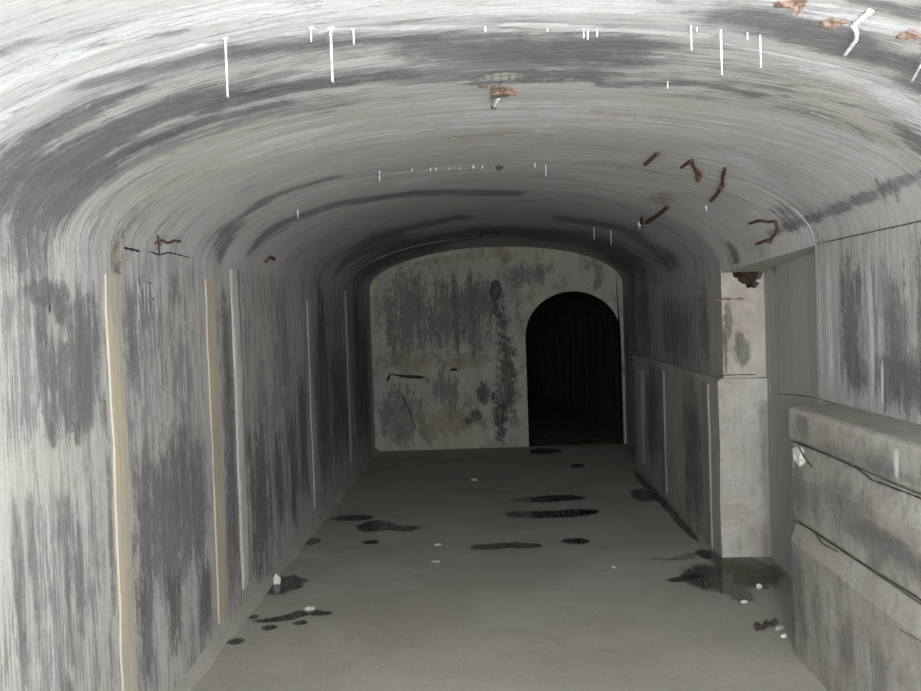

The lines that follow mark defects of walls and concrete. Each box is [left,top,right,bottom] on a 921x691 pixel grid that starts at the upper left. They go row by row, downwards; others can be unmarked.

water stain [0,0,768,128]
water stain [701,0,921,153]
crack [113,230,191,274]
water stain [0,71,420,272]
water stain [215,167,521,258]
water stain [770,174,920,236]
water stain [27,278,106,448]
water stain [247,215,678,584]
water stain [818,243,921,418]
water stain [227,428,239,559]
crack [792,441,921,499]
crack [791,519,921,601]